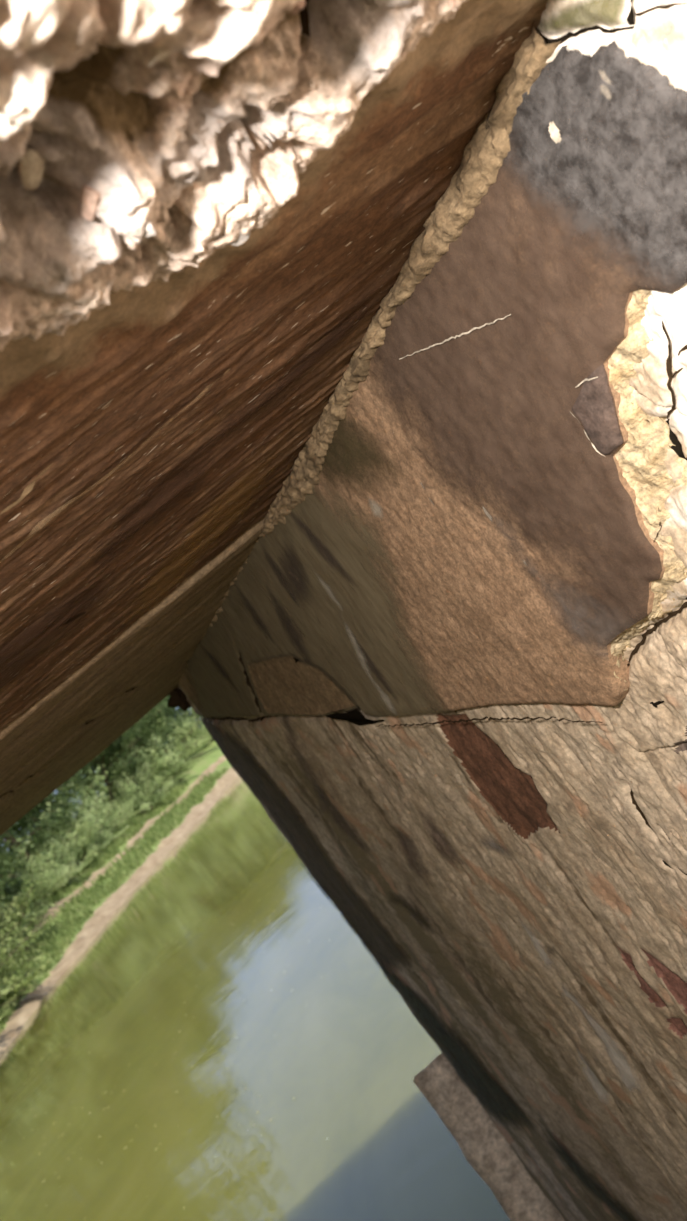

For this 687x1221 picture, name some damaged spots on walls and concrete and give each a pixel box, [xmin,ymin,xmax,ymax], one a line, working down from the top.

crack [536,0,687,45]
peeling [548,121,562,144]
crack [661,320,687,460]
spalling [608,289,687,690]
crack [627,598,687,666]
crack [203,654,287,723]
crack [375,716,603,727]